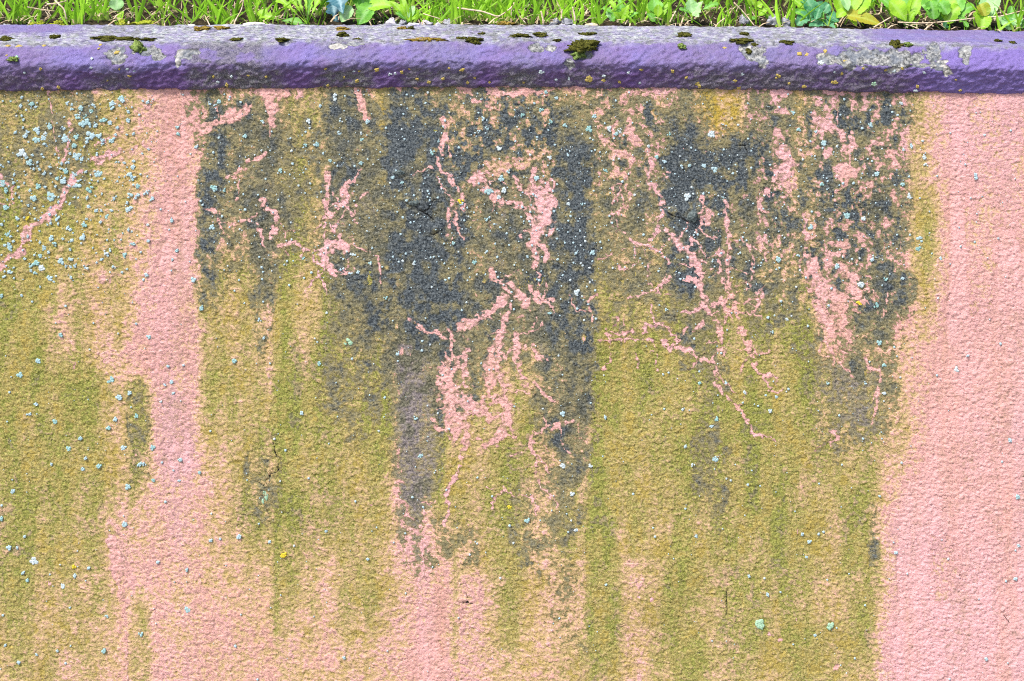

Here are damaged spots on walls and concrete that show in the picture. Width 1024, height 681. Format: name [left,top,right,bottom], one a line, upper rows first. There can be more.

peeling [103,45,201,68]
peeling [738,43,769,69]
peeling [816,42,973,77]
water stain [815,341,835,361]
water stain [831,442,850,458]
water stain [867,529,881,566]